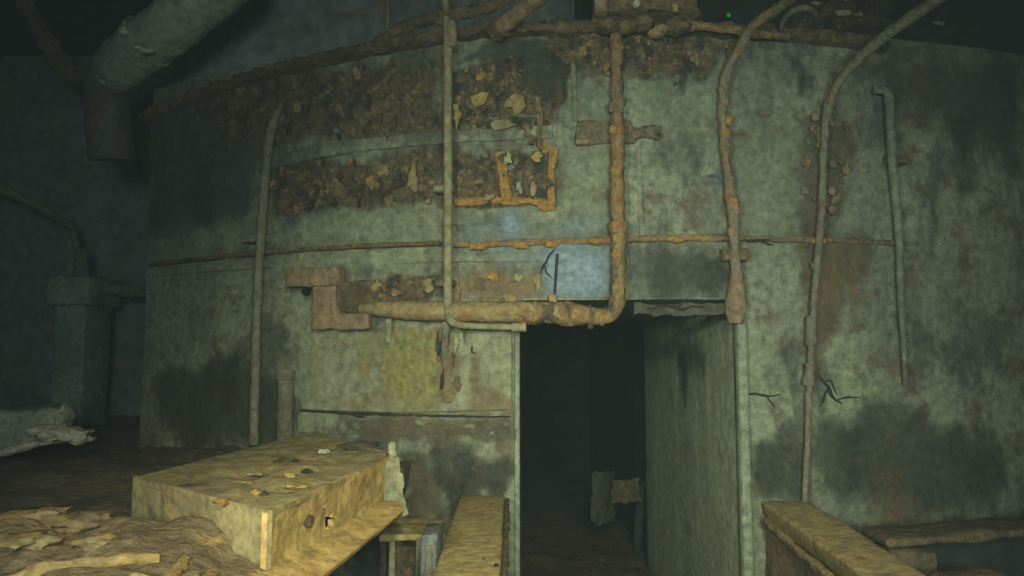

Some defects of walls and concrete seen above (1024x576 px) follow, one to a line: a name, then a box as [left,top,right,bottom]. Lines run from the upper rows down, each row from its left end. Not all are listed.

corrosion [196,33,735,215]
corrosion [800,100,869,348]
crack [540,249,555,278]
water stain [160,357,277,447]
peeling [432,329,466,403]
crack [749,393,781,407]
crack [818,375,860,406]
water stain [753,439,804,499]
water stain [821,403,1005,511]